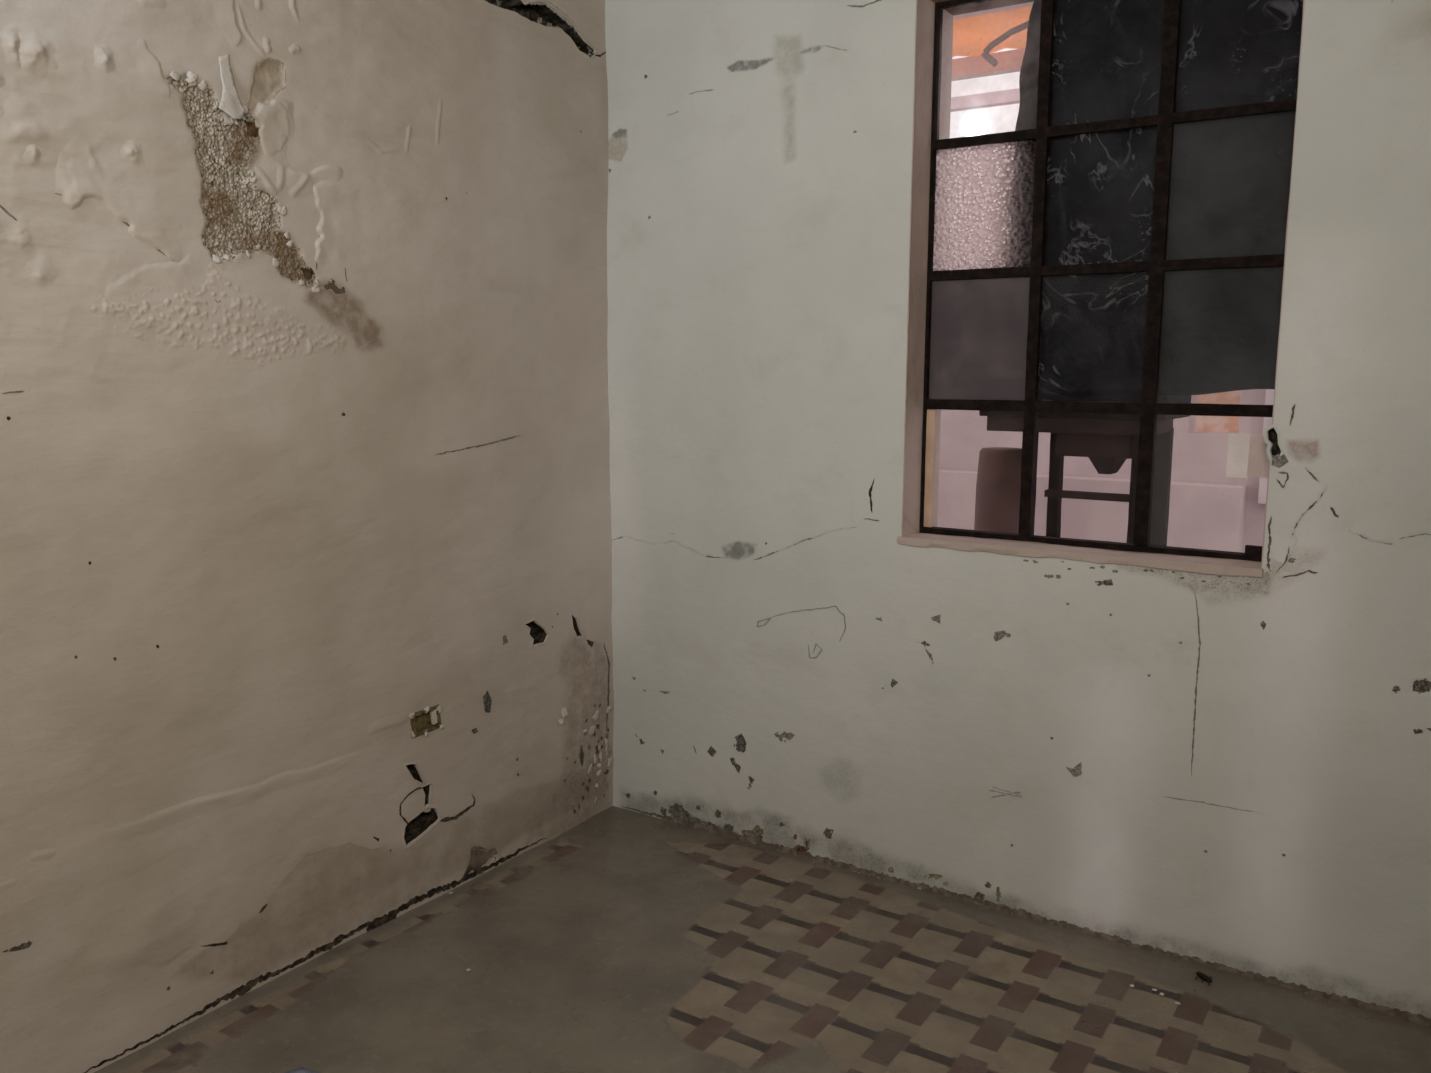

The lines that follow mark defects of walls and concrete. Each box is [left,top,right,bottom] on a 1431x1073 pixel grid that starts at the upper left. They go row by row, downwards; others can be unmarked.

crack [477,0,606,61]
spalling [167,0,364,294]
crack [1264,468,1339,578]
crack [1191,592,1201,777]
spalling [1392,678,1431,694]
peeling [693,733,755,790]
peeling [774,731,794,743]
hole [373,762,475,852]